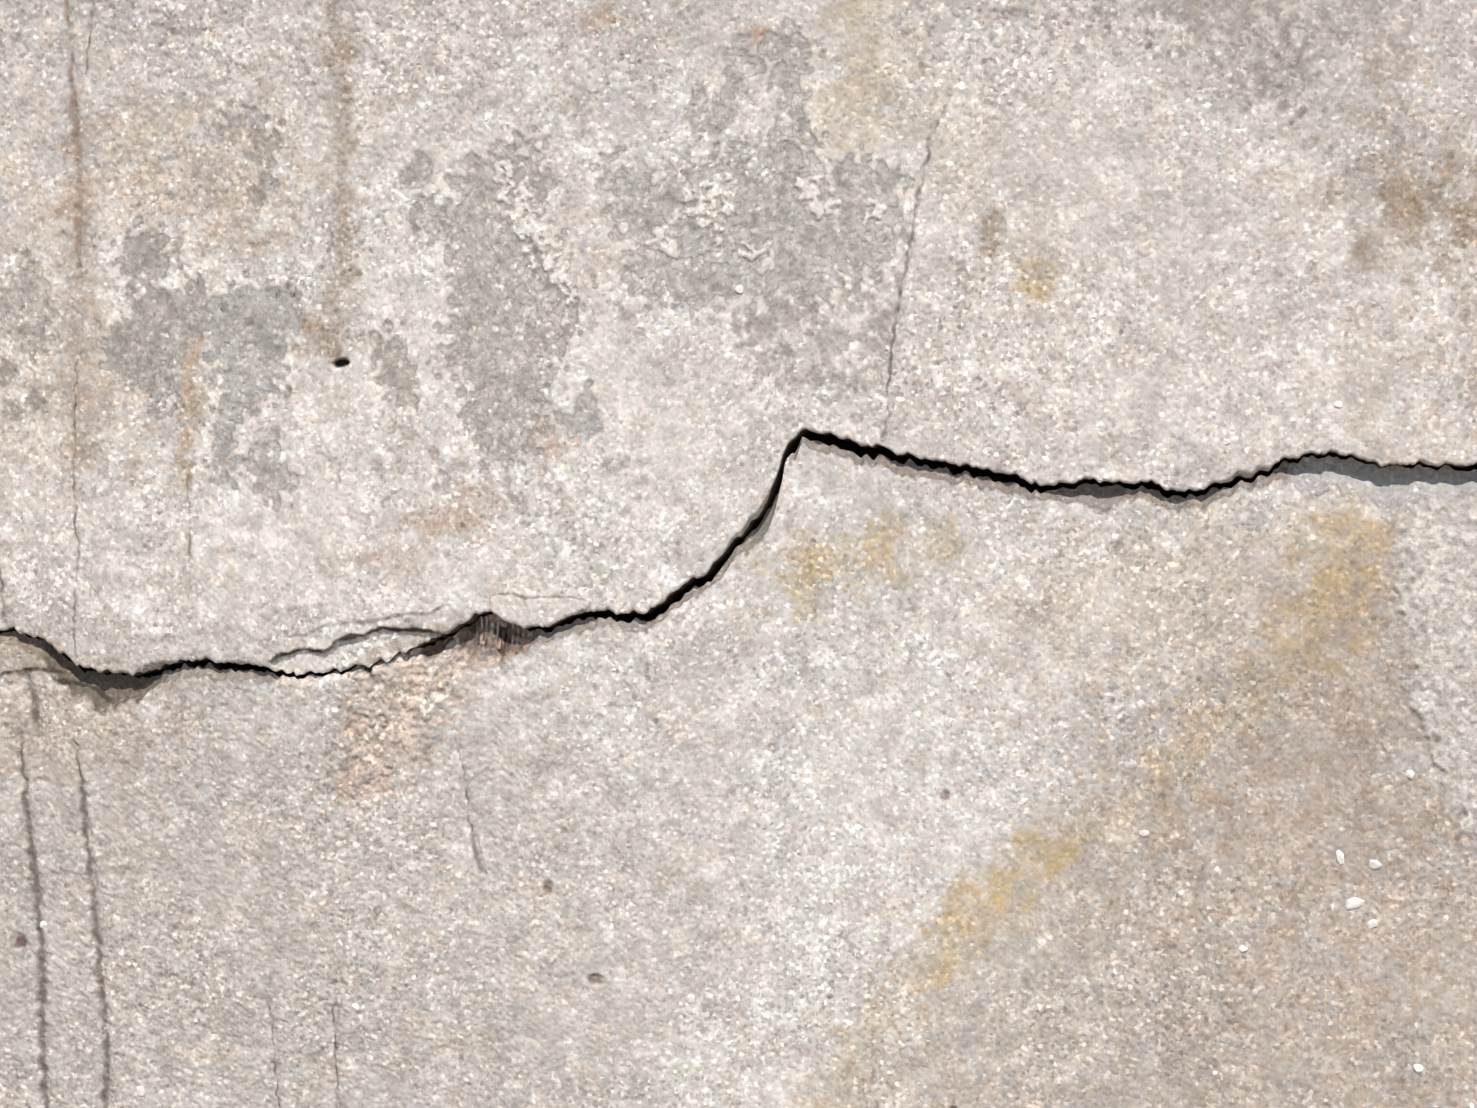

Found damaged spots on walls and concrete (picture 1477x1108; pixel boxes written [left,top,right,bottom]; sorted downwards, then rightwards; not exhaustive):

crack [0,429,1477,712]